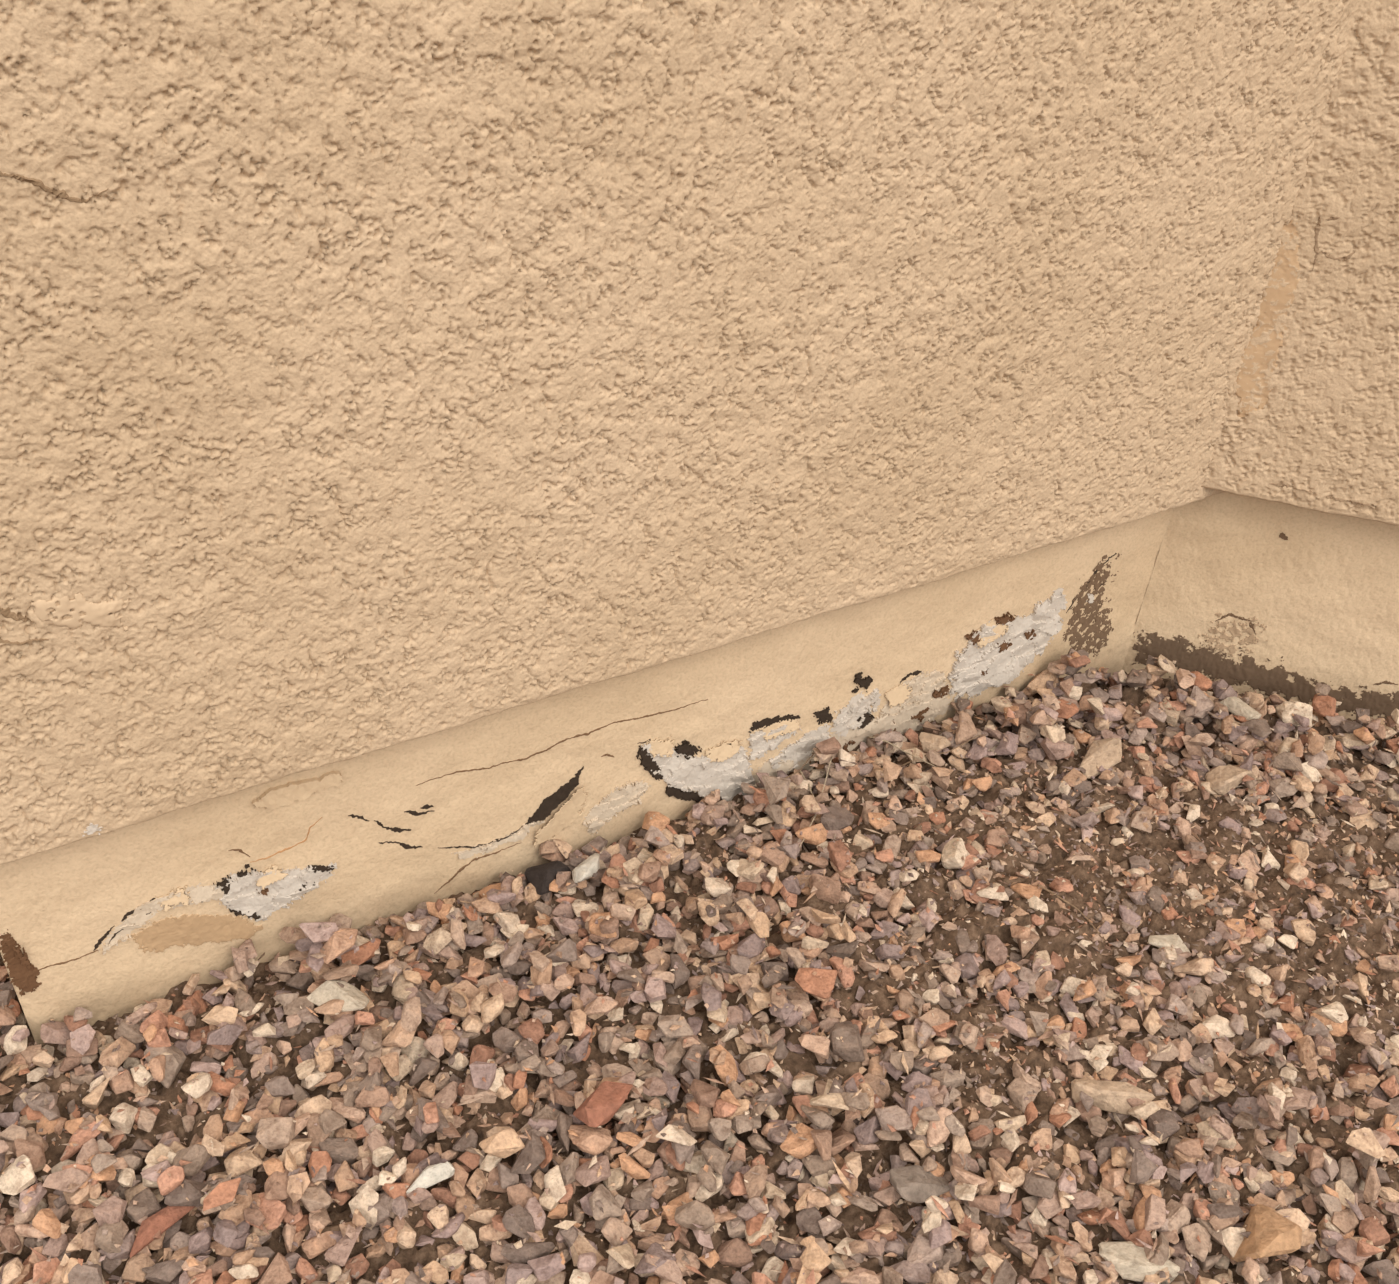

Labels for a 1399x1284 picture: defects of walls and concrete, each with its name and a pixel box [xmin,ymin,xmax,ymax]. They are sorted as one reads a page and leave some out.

peeling [965,612,1036,653]
crack [229,699,708,894]
peeling [98,862,337,955]